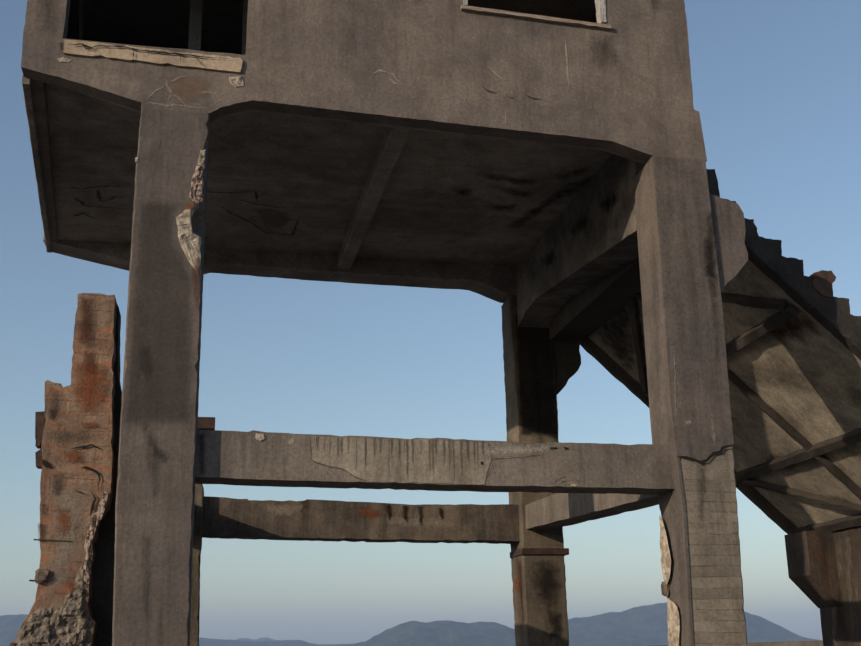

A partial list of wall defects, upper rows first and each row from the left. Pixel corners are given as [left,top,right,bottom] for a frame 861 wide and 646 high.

crack [69,43,226,108]
spalling [176,149,206,301]
peeling [310,436,568,485]
spalling [83,491,109,590]
spalling [659,515,680,646]